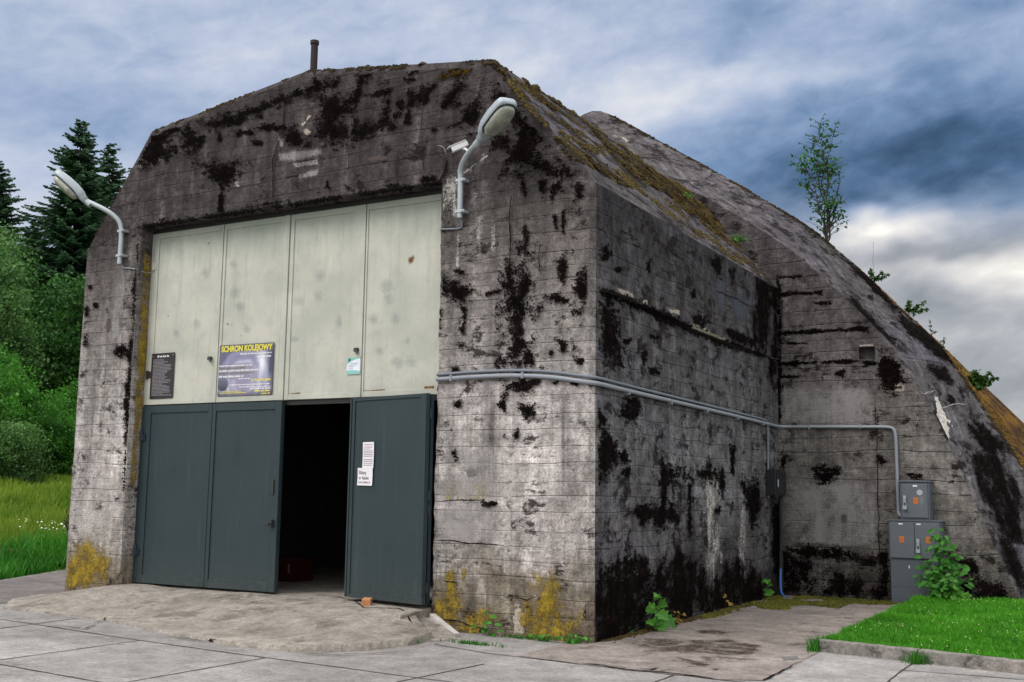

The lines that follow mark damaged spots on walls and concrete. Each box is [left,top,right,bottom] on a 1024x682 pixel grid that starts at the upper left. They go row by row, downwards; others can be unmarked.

leakage [279,138,318,177]
crack [436,496,485,504]
crack [436,538,498,546]